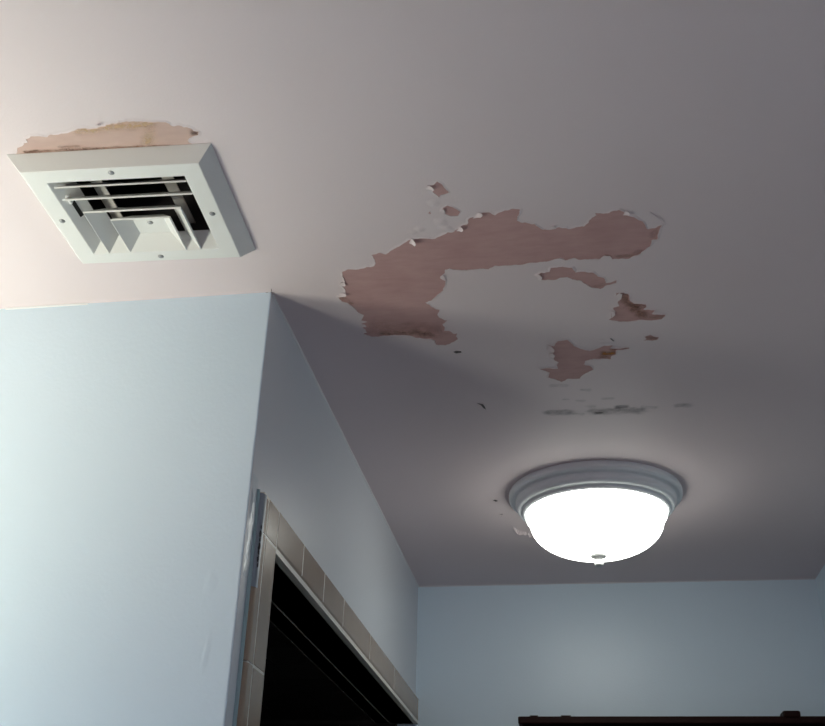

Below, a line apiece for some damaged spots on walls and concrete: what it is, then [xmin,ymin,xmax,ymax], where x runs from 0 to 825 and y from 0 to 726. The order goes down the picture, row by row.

peeling [14,118,202,154]
peeling [335,180,667,354]
peeling [538,338,631,383]